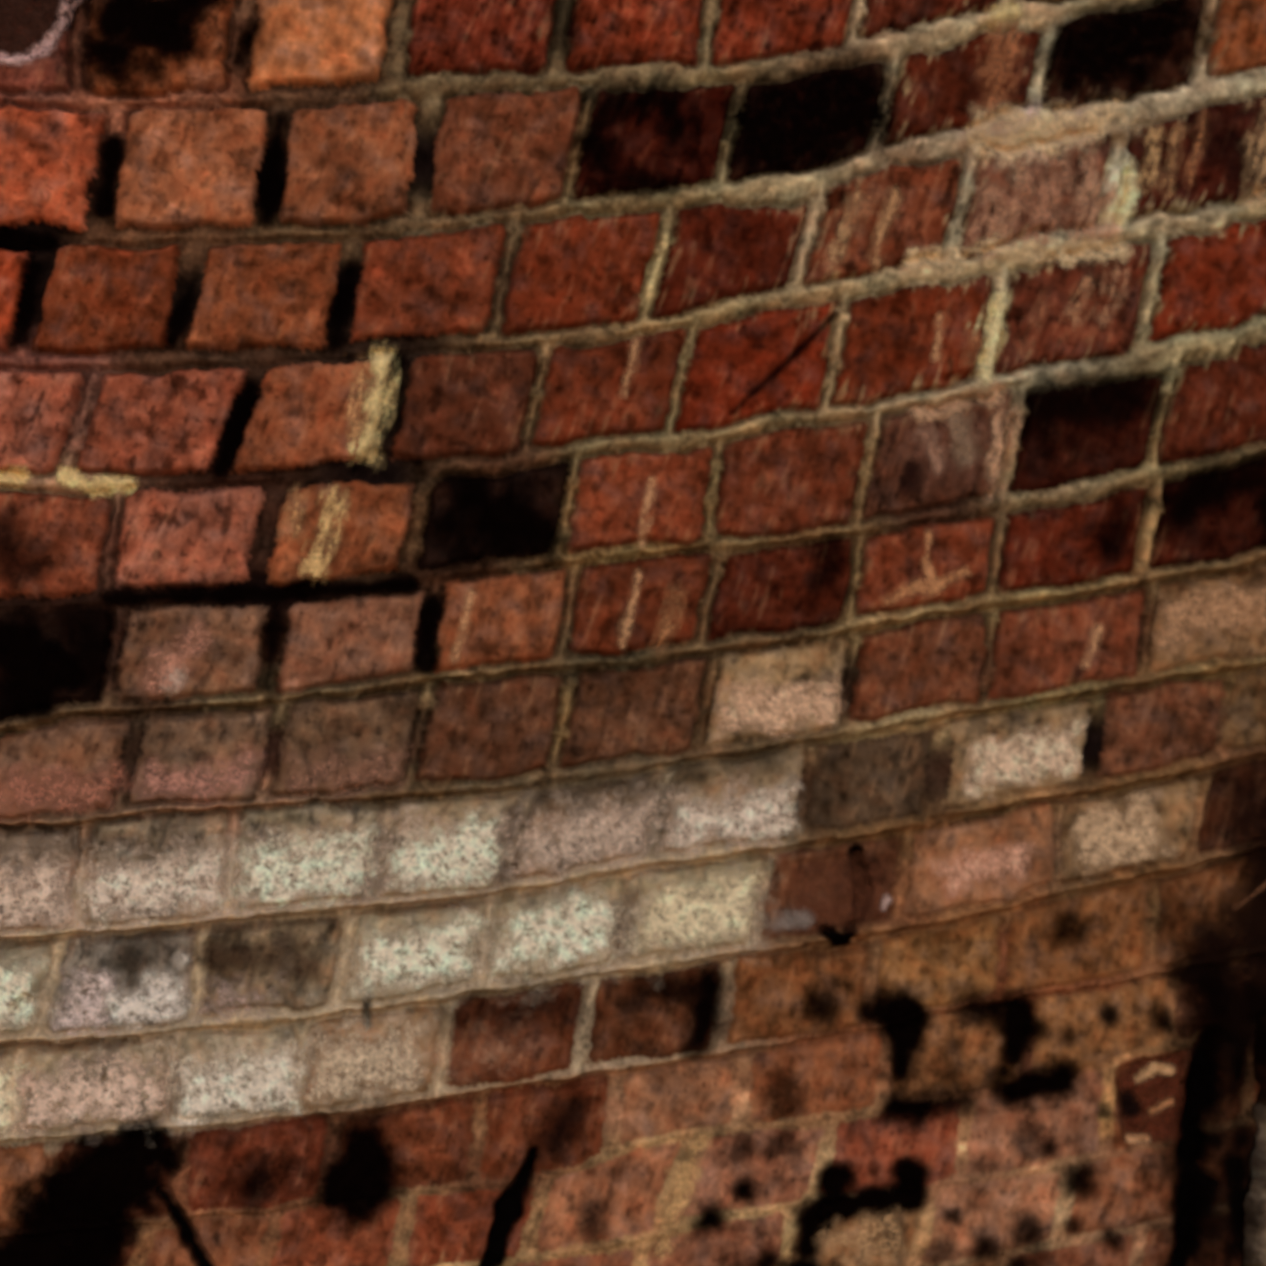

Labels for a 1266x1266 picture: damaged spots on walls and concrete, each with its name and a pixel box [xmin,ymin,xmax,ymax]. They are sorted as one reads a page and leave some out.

water stain [348,348,407,462]